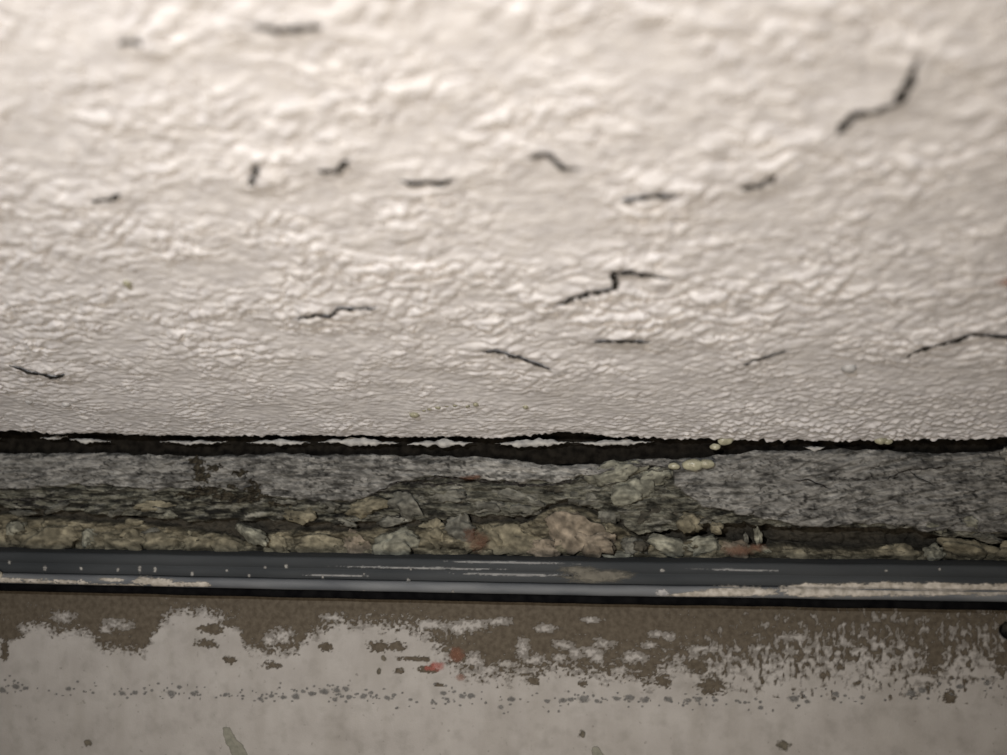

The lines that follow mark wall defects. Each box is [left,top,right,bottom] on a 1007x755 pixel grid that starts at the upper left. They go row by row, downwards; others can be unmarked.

crack [830,56,921,142]
crack [0,430,1007,495]
spalling [0,456,811,559]
spalling [877,511,1007,561]